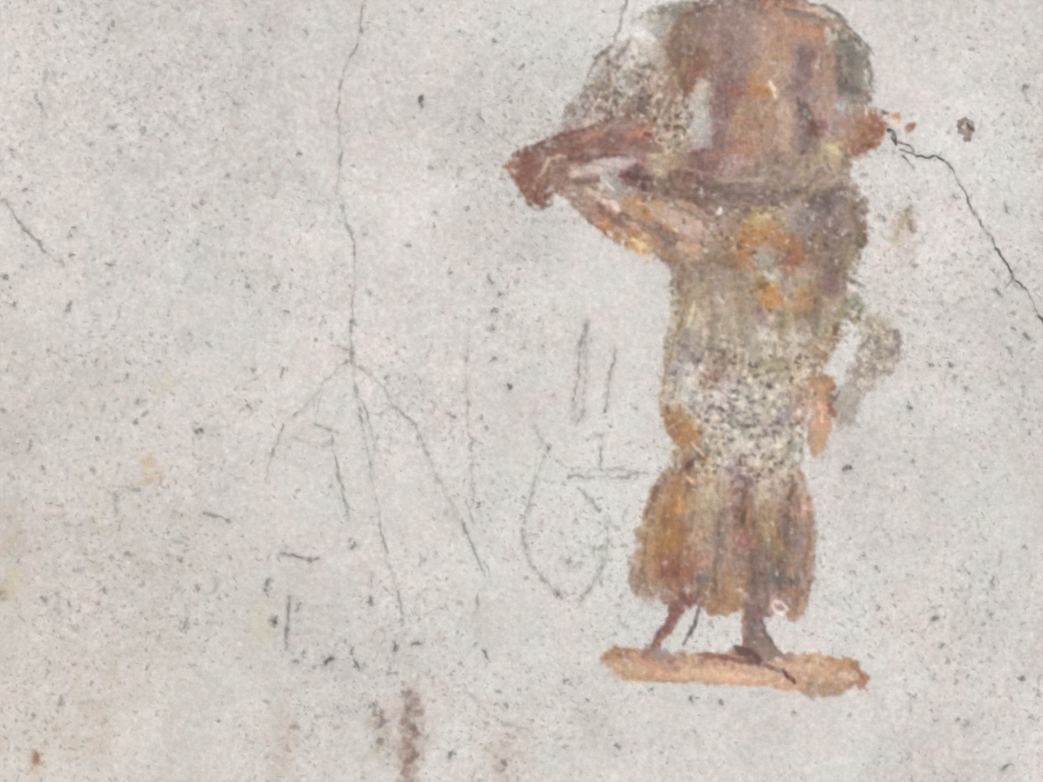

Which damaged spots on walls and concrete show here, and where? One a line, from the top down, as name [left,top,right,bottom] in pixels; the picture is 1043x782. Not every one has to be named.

crack [884,124,1043,327]